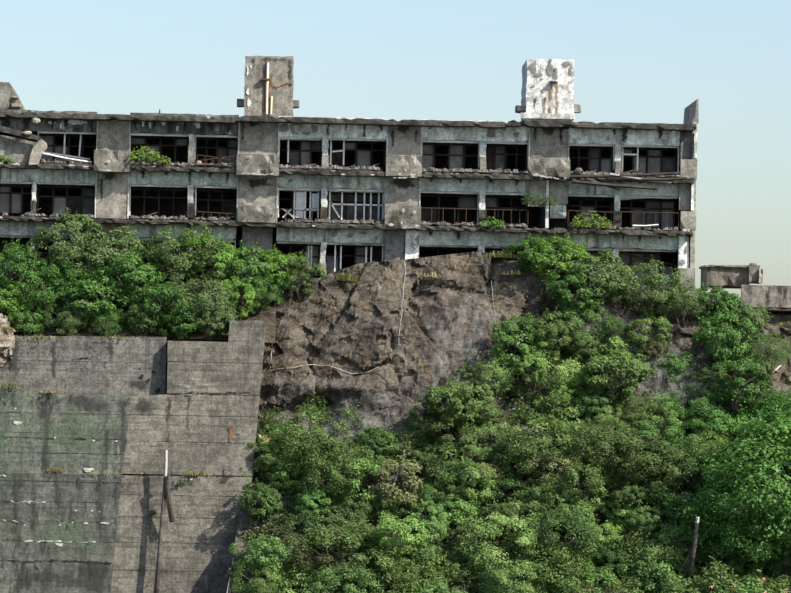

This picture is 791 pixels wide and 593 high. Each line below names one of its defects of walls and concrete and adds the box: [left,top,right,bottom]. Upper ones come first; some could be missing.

rust [263,59,291,112]
peeling [527,58,572,102]
rust [543,83,559,114]
damp [10,342,18,371]
damp [70,395,106,410]
damp [137,400,151,413]
damp [4,481,72,547]